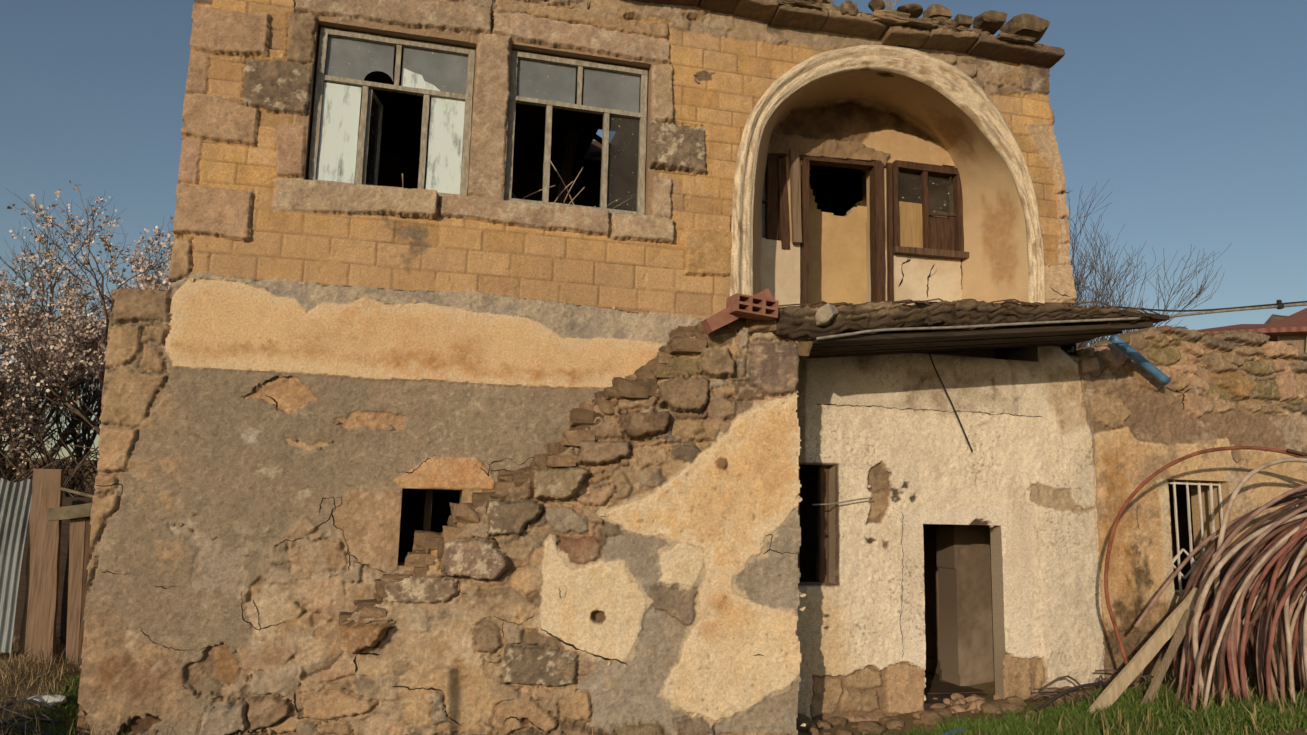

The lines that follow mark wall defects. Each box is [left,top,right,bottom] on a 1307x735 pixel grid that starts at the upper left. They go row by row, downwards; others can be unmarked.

flaking render [773,98,939,143]
crack [898,256,963,297]
flaking render [163,272,775,347]
spalling [245,375,317,413]
spalling [242,427,262,444]
spalling [333,409,407,431]
flaking render [866,460,917,548]
flaking render [1026,481,1095,515]
crack [275,497,386,573]
crack [241,592,283,630]
flaking render [577,498,926,735]